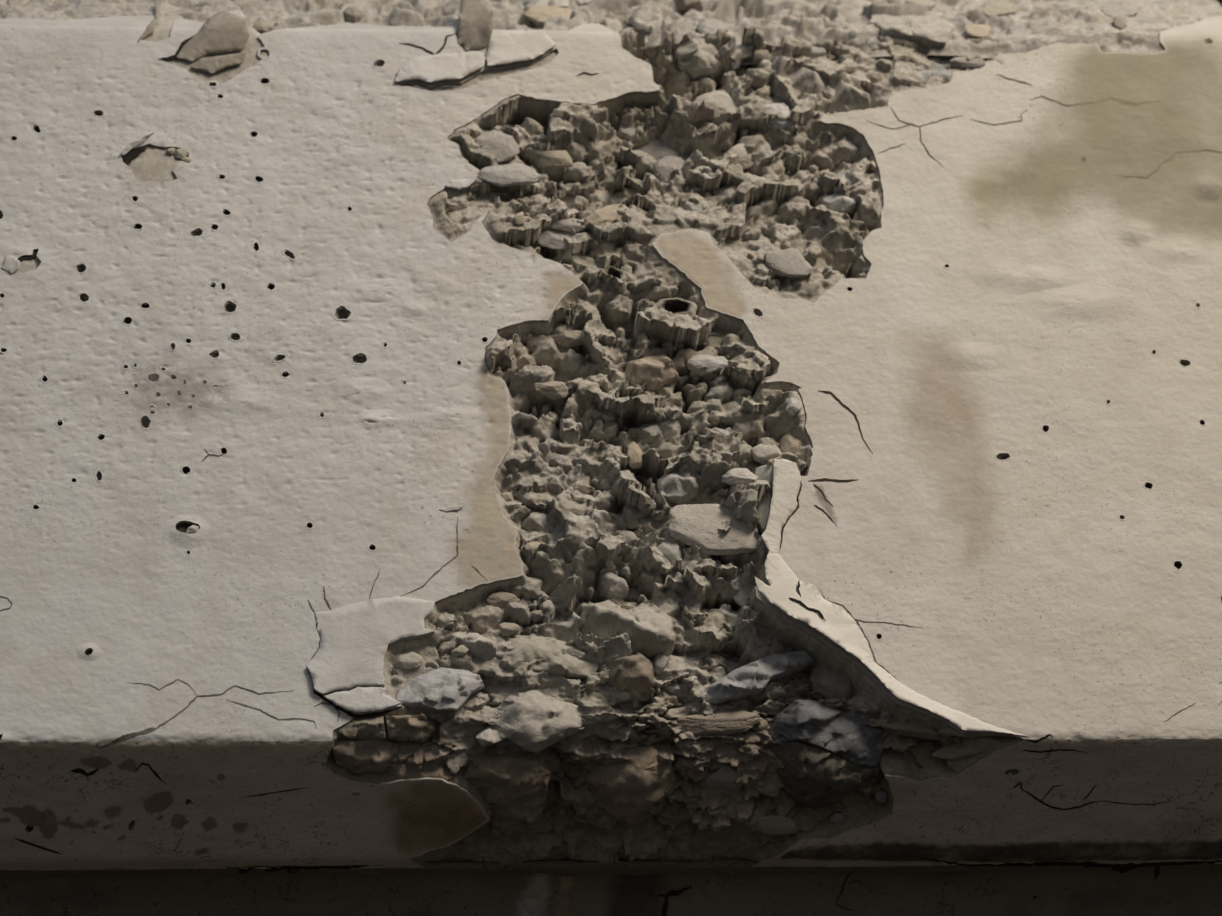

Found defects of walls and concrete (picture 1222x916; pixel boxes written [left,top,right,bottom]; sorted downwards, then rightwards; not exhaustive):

spalling [0,0,1222,85]
peeling [120,132,191,182]
crack [869,74,1079,164]
damp [1022,49,1222,224]
spalling [306,27,1026,865]
crack [818,390,873,454]
crack [779,478,859,551]
crack [71,679,378,785]
crack [1023,734,1086,753]
crack [1014,782,1176,811]
crack [658,887,692,916]
crack [920,858,1222,879]